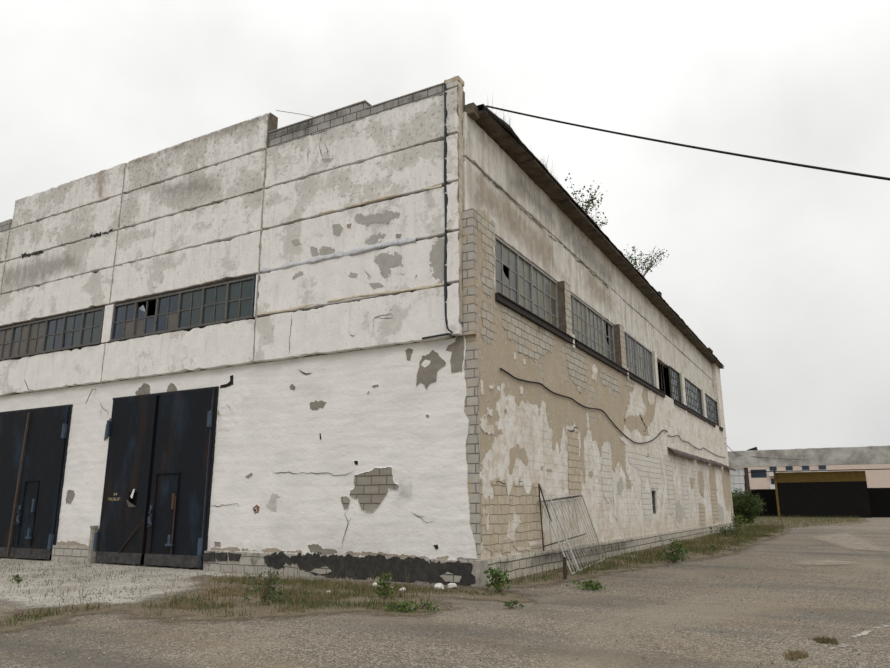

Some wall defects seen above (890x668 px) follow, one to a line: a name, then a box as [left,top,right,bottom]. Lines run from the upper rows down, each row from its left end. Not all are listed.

peeling [291,238,336,257]
peeling [332,210,403,290]
peeling [427,238,448,284]
spalling [405,335,465,389]
peeling [476,208,657,556]
spalling [340,460,400,514]
peeling [689,465,734,527]